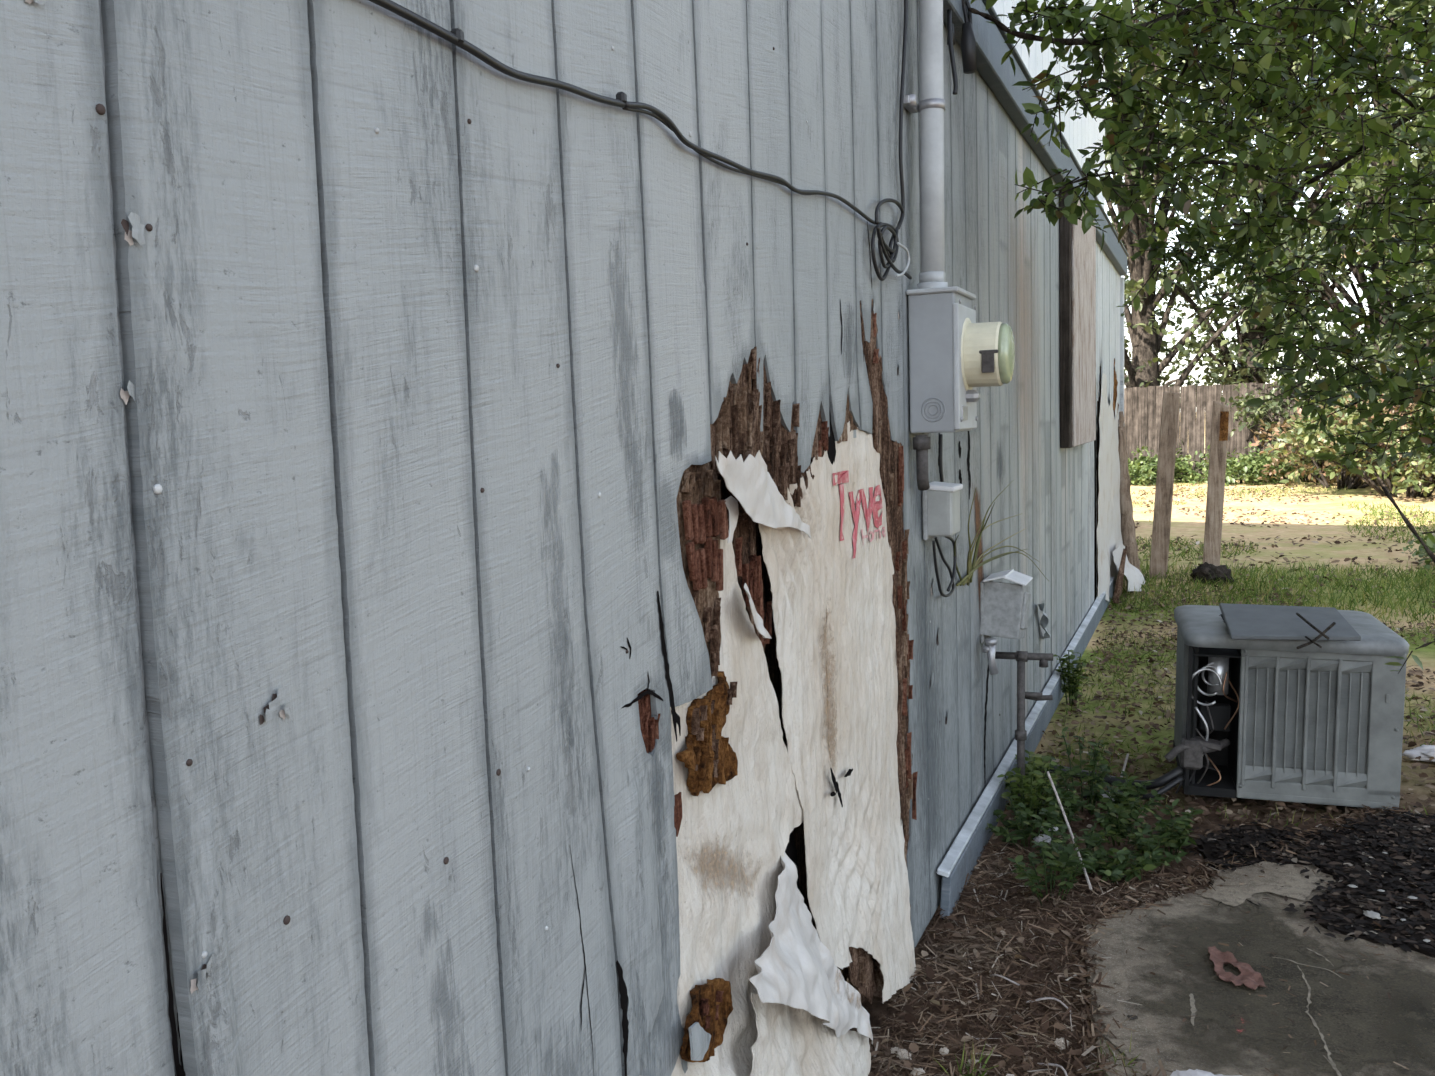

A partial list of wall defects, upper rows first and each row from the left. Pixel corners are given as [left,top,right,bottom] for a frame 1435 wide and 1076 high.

peeling [871,302,879,364]
peeling [818,421,829,457]
peeling [889,446,904,507]
peeling [681,346,801,789]
peeling [644,689,660,752]
crack [160,873,186,1076]
crack [570,848,629,1076]
peeling [689,991,724,1061]